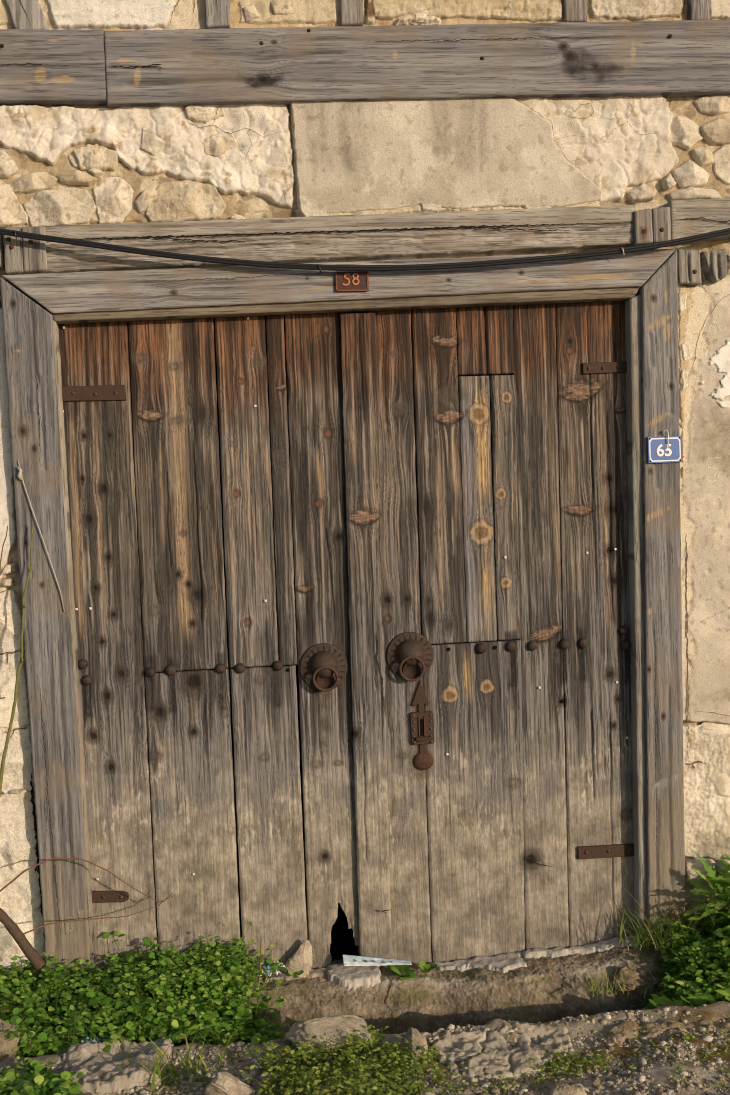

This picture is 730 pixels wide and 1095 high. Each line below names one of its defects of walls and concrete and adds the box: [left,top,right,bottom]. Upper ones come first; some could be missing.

peeling [678,254,730,487]
spalling [0,563,45,969]